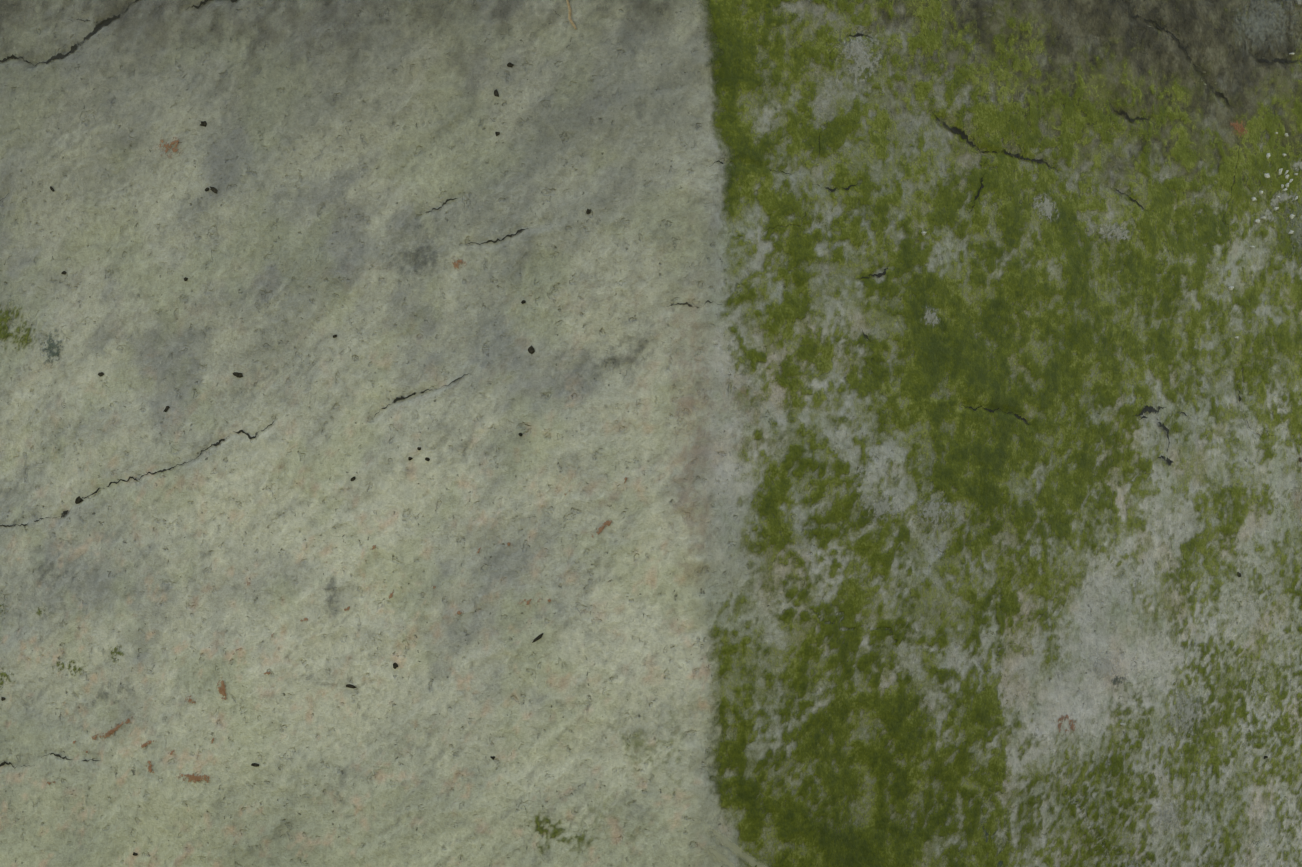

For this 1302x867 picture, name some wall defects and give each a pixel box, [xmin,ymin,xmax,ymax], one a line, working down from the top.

crack [0,0,139,66]
damp [866,0,1302,199]
crack [1128,1,1232,107]
crack [932,112,1057,213]
crack [0,419,277,527]
crack [375,373,469,415]
damp [1134,405,1187,465]